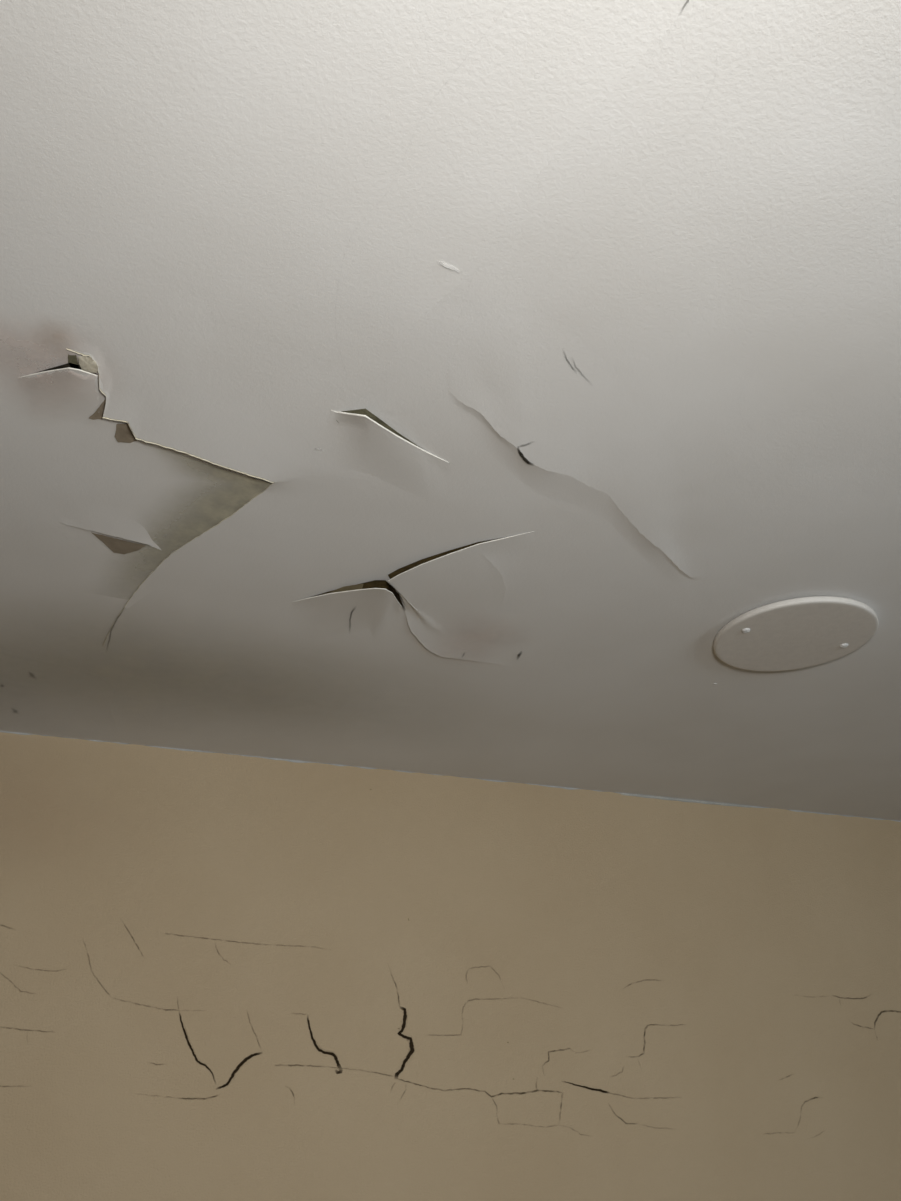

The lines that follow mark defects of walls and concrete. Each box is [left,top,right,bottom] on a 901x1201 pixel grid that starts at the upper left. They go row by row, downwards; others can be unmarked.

peeling [447,264,706,586]
peeling [404,604,516,667]